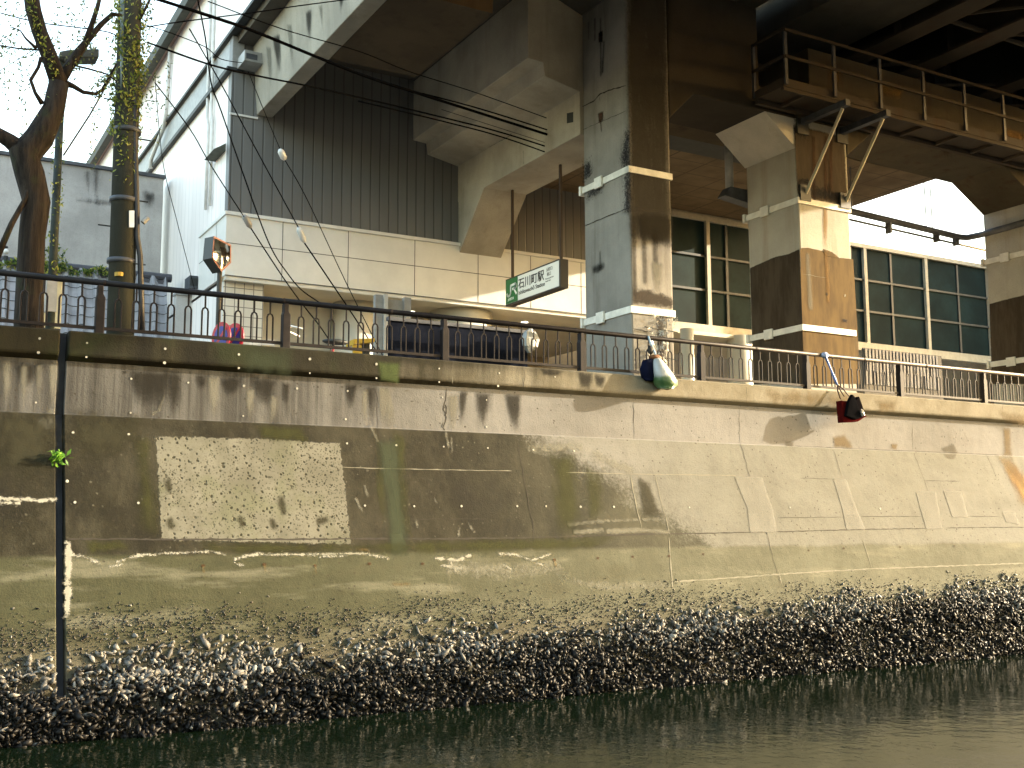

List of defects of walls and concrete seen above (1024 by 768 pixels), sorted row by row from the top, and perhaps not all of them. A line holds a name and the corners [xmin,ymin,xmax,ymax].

damp [622,169,632,213]
damp [133,372,180,403]
damp [198,378,289,410]
damp [346,363,399,414]
damp [450,392,488,419]
damp [507,396,519,421]
crack [68,386,1024,582]
rust [1002,430,1024,498]